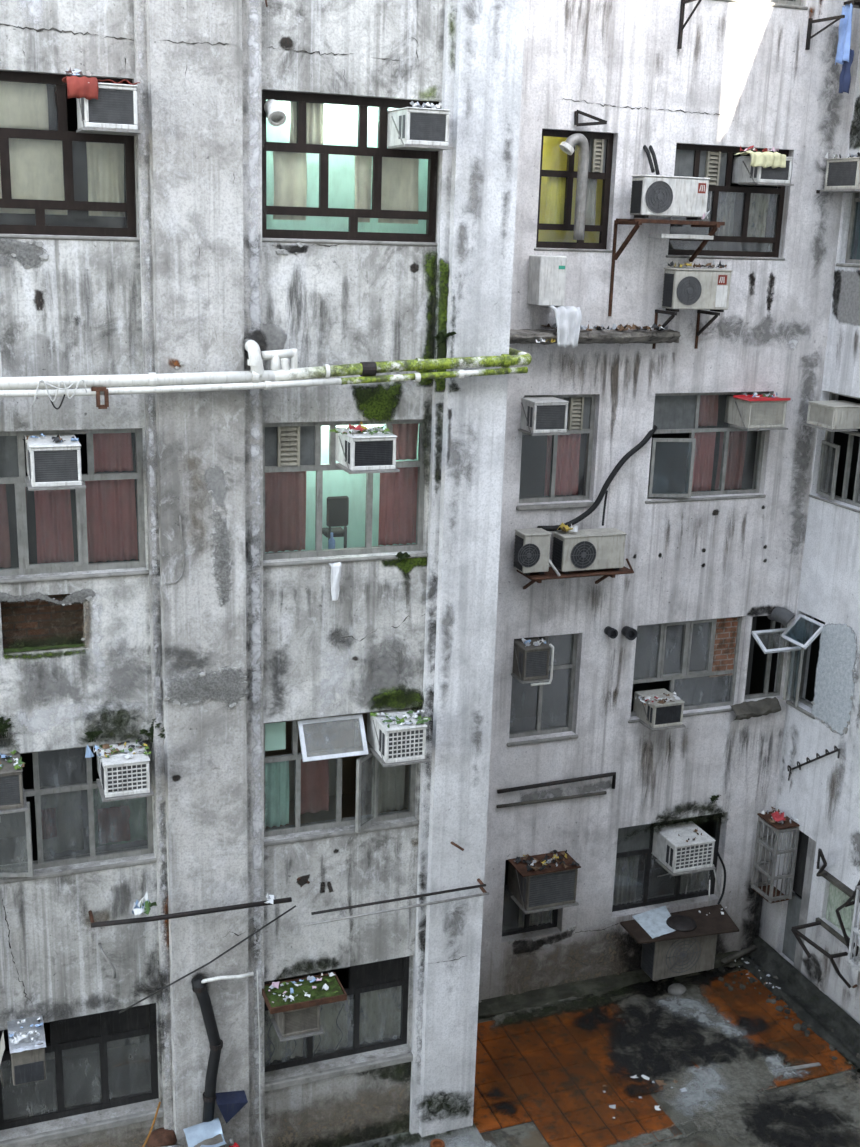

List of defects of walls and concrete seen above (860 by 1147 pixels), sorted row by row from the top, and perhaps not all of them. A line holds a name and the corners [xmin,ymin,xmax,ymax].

crack [0,23,228,80]
damp [821,27,860,149]
damp [814,166,829,264]
flaking render [0,237,49,269]
flaking render [0,589,95,650]
damp [658,997,743,1036]